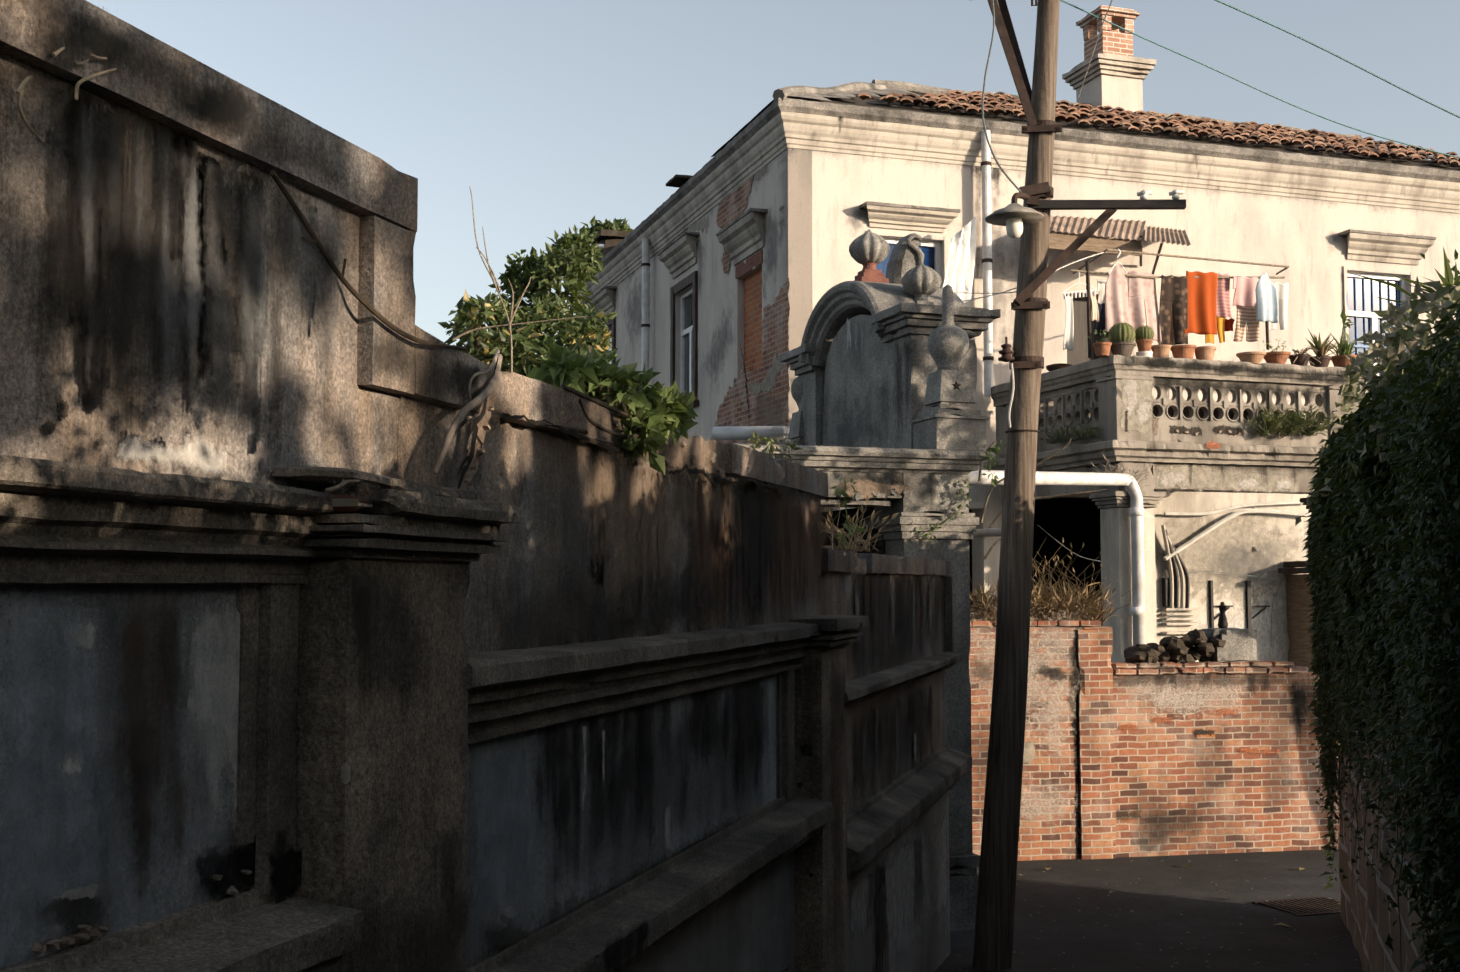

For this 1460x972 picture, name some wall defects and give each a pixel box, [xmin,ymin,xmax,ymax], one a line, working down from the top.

water stain [49,137,290,405]
flaking render [715,165,767,274]
flaking render [596,278,790,482]
water stain [506,484,776,649]
water stain [537,684,764,868]
water stain [832,575,945,873]
flaking render [30,882,109,954]
water stain [268,831,302,904]
water stain [606,921,648,972]